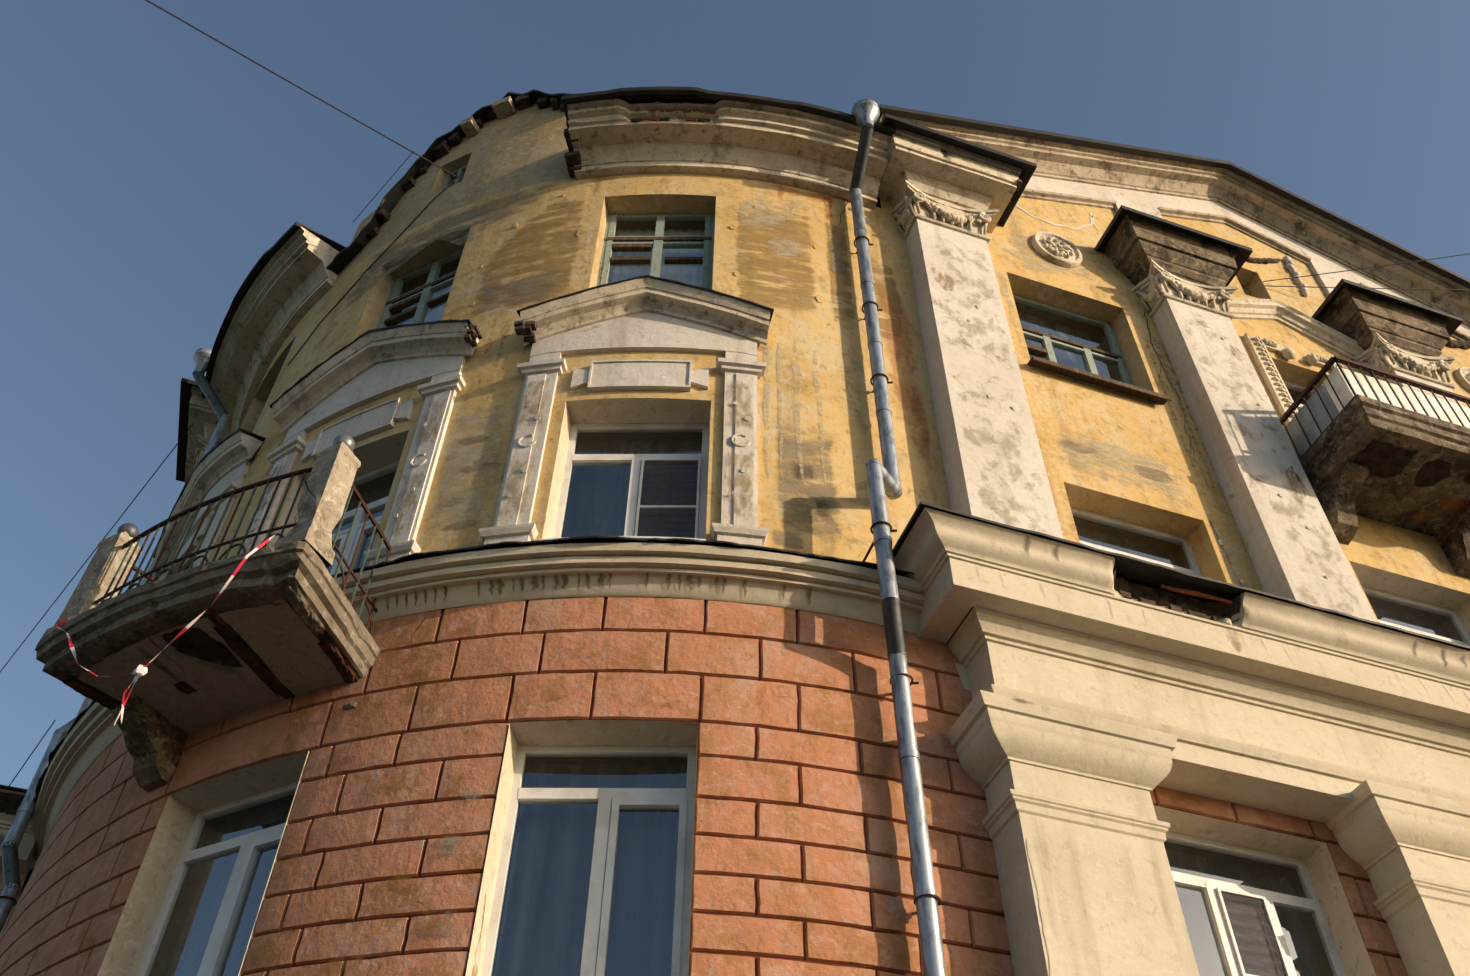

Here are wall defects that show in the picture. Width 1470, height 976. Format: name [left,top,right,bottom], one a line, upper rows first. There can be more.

peeling [340,106,586,348]
peeling [730,199,854,316]
peeling [870,258,902,336]
spalling [1354,440,1451,487]
spalling [1114,520,1247,623]
spalling [145,608,295,700]